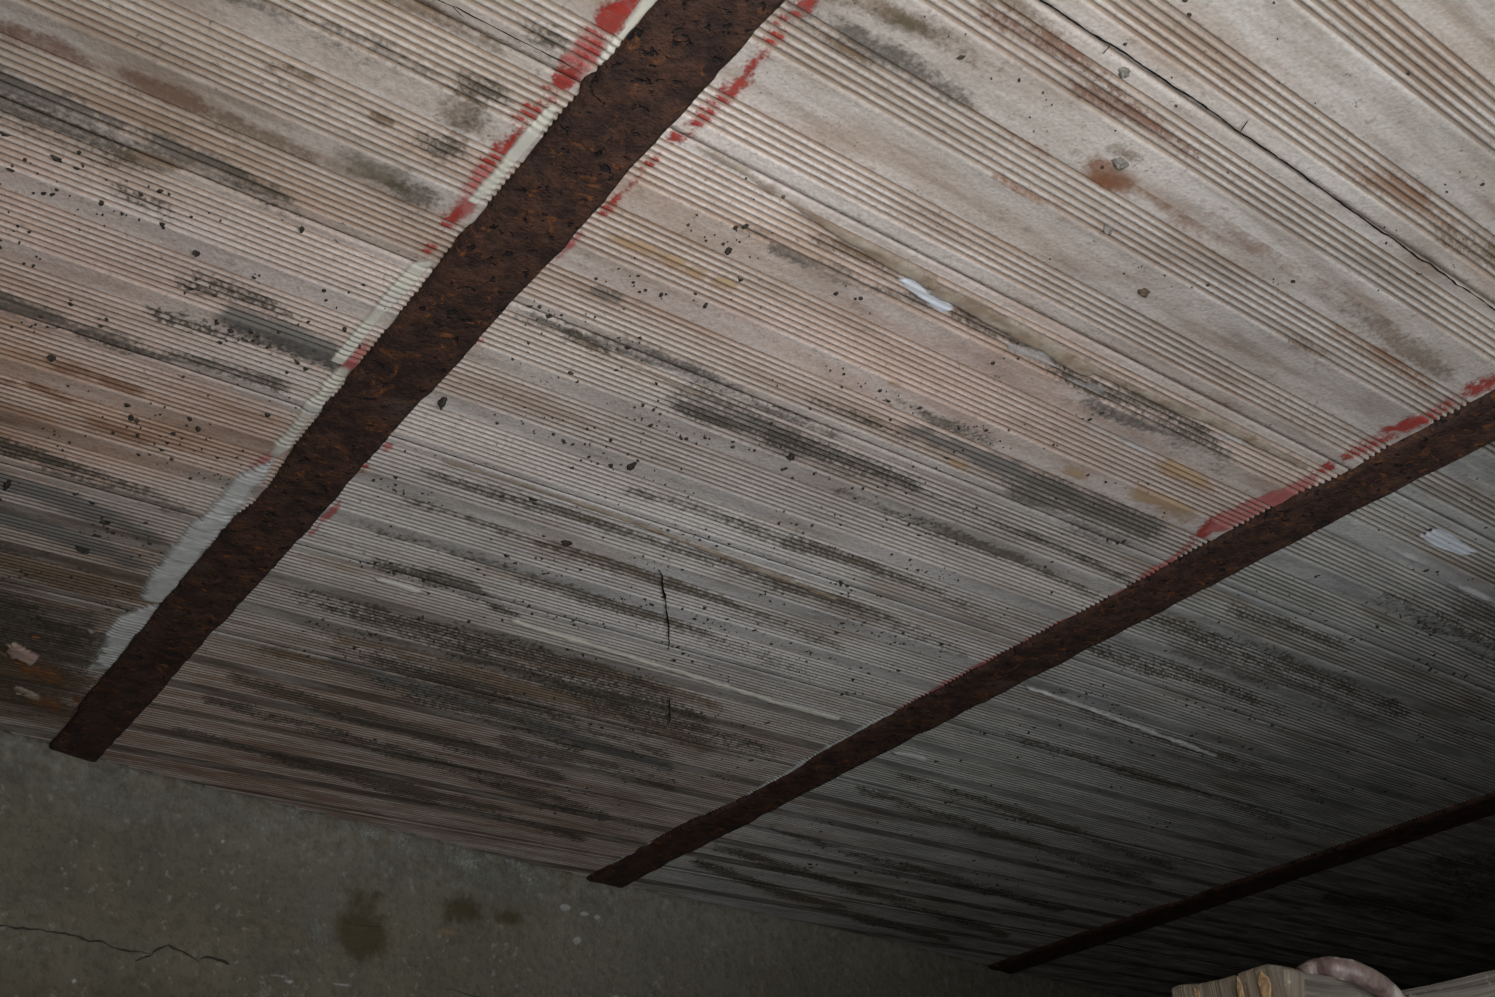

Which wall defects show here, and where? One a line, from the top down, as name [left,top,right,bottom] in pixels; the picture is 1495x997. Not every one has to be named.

rust [0,26,85,64]
crack [1039,0,1495,311]
rust [1366,175,1495,260]
rust [1368,318,1449,387]
damp [102,402,244,489]
damp [0,427,171,632]
damp [970,578,1495,840]
damp [690,774,1188,941]
crack [0,924,230,965]